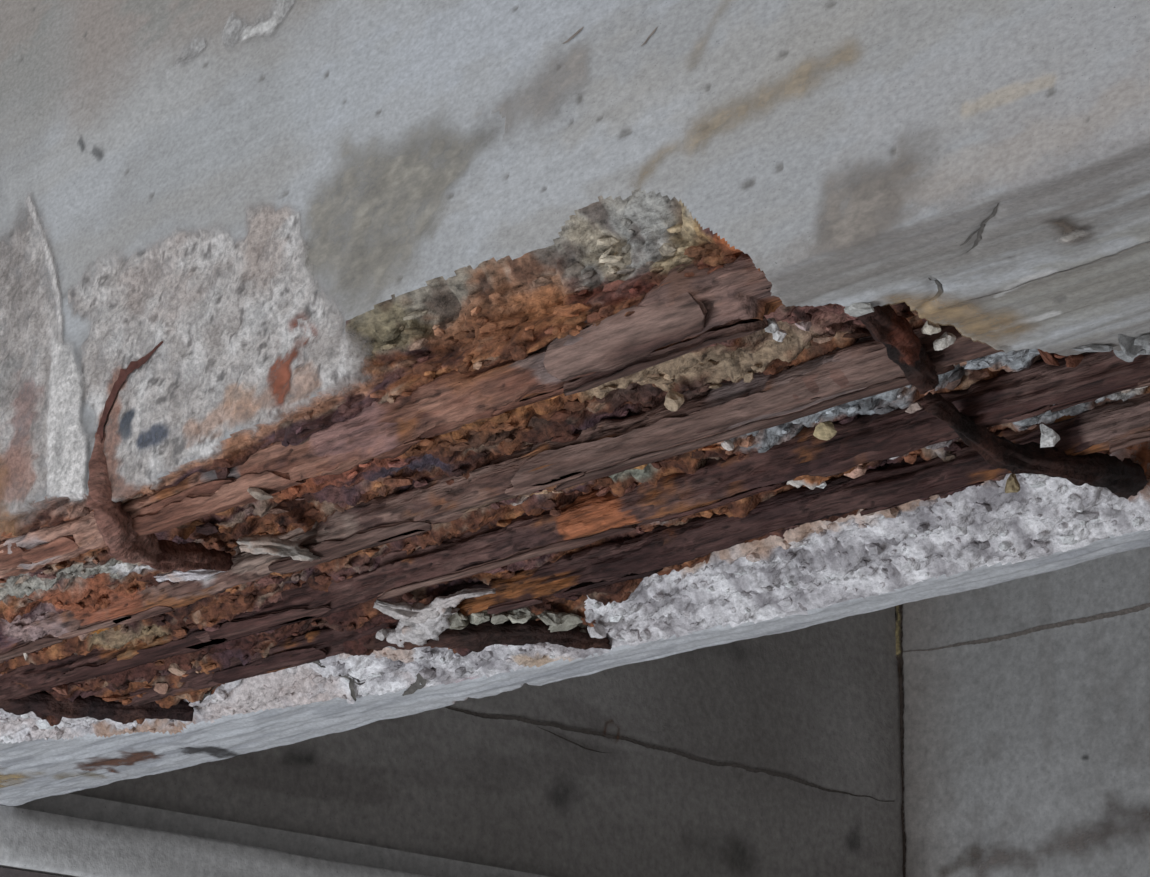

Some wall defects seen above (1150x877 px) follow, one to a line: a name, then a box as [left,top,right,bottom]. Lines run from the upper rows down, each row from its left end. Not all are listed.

peeling [222,0,294,46]
water stain [307,135,476,289]
crack [960,203,999,252]
crack [927,242,1150,308]
rust [890,297,1022,337]
rust [268,330,315,405]
peeling [0,188,743,544]
spalling [0,302,1150,744]
crack [402,673,426,696]
rust [79,752,158,776]
crack [445,603,1150,877]